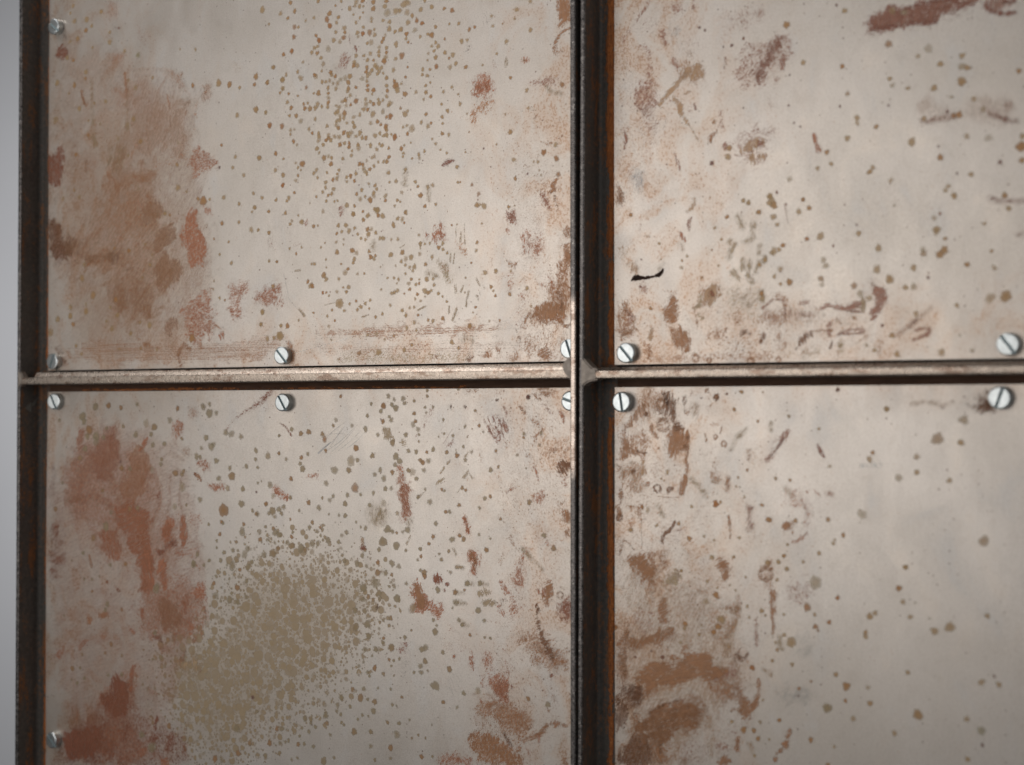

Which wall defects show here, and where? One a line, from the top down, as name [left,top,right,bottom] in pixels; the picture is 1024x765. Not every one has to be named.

corrosion [658,51,717,143]
corrosion [723,22,805,91]
corrosion [862,0,1017,47]
corrosion [48,145,80,199]
corrosion [46,218,295,368]
corrosion [329,197,570,361]
crack [631,268,664,281]
corrosion [43,385,466,765]
corrosion [606,387,795,765]
corrosion [467,713,524,765]